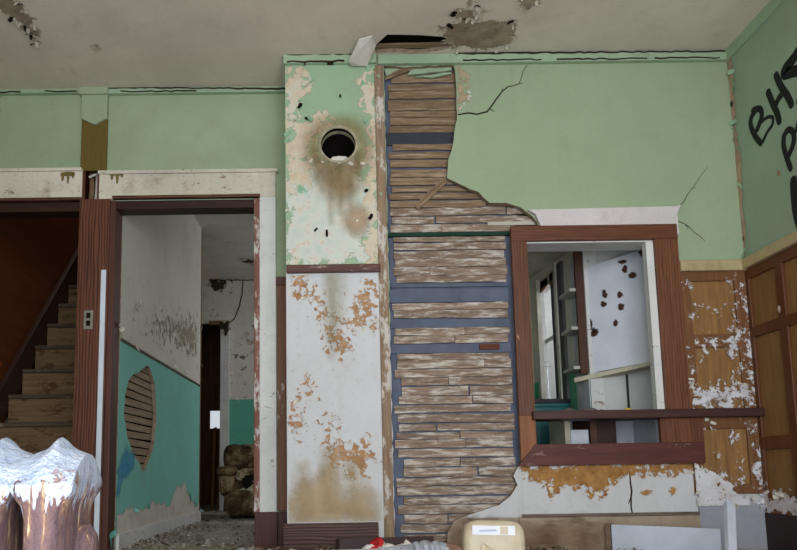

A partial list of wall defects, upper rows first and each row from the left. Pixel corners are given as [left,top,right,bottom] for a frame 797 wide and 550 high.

peeling [0,0,42,48]
peeling [436,0,518,55]
peeling [516,0,542,11]
crack [458,50,725,115]
crack [678,168,707,241]
flaking render [284,58,797,542]
flaking render [124,367,153,469]
peeling [109,482,203,548]
water stain [288,465,377,522]